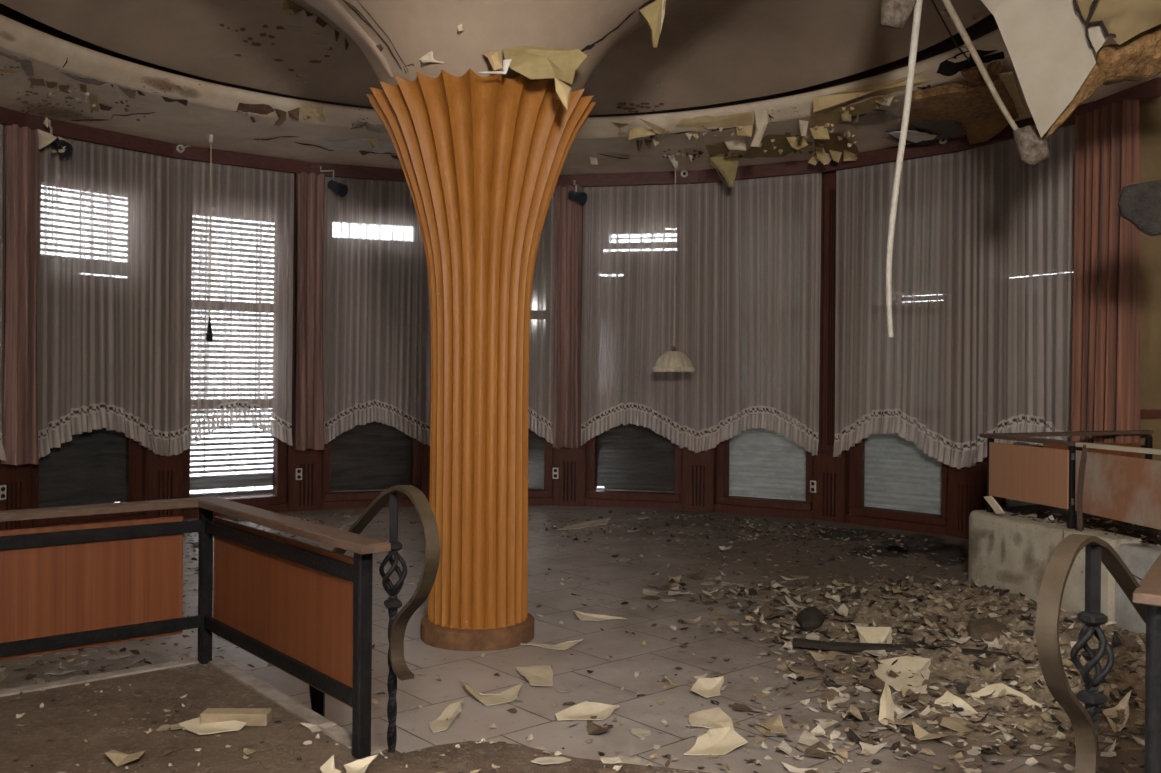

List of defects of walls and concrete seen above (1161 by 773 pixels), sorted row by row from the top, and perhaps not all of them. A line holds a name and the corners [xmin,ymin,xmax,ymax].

crack [1074,0,1116,53]
peeling [0,52,145,153]
peeling [404,51,444,73]
peeling [478,46,587,110]
spalling [589,50,1026,189]